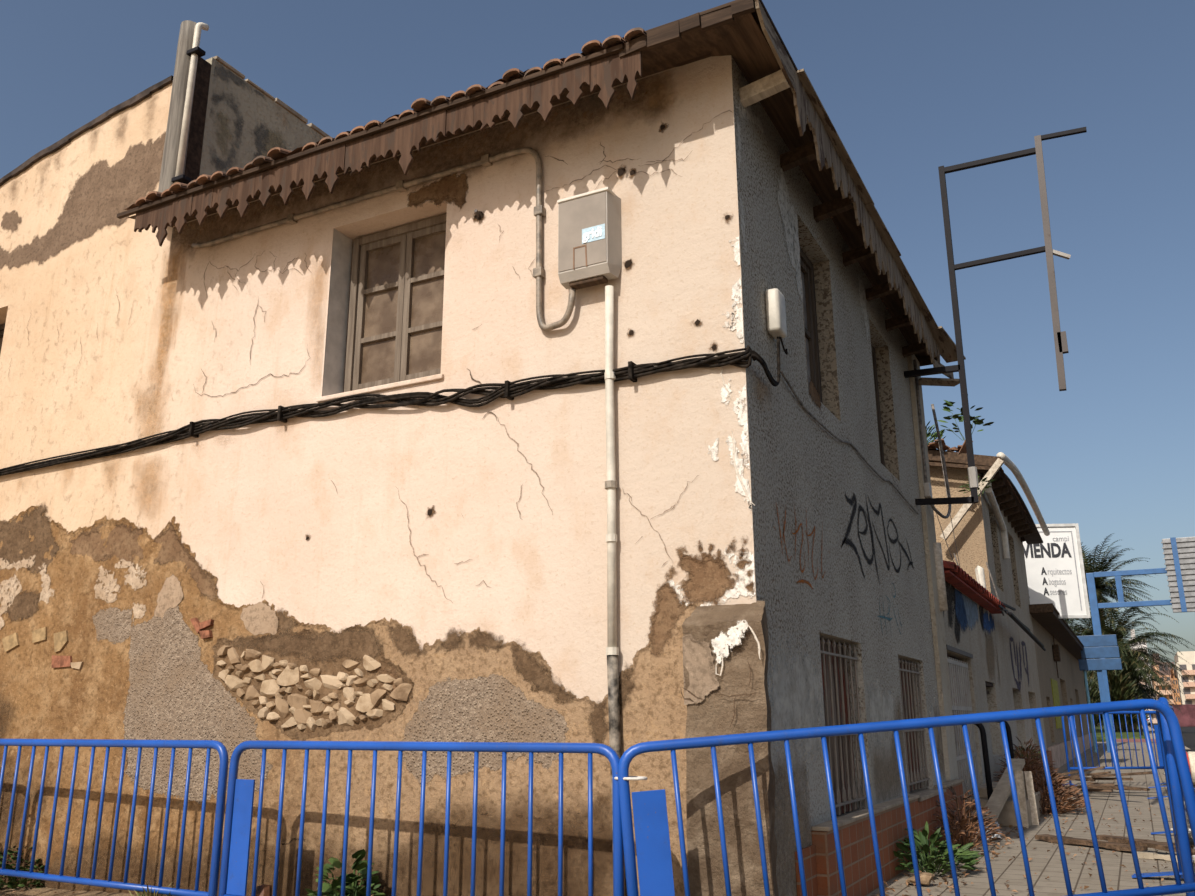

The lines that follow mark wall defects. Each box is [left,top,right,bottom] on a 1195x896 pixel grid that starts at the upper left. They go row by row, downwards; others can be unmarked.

water stain [171,77,663,248]
peeling [408,173,485,223]
crack [193,251,311,397]
spalling [722,197,747,343]
crack [482,412,553,515]
spalling [708,367,754,510]
crack [398,491,491,601]
crack [624,475,699,576]
peeling [0,505,755,896]
water stain [0,765,25,835]
water stain [0,845,222,896]
water stain [246,805,613,896]